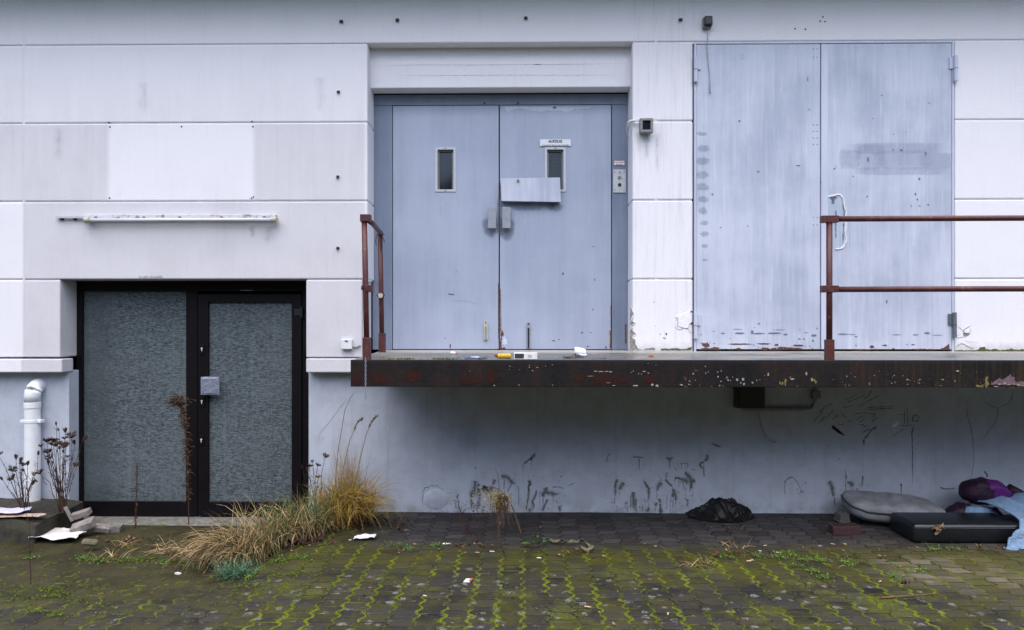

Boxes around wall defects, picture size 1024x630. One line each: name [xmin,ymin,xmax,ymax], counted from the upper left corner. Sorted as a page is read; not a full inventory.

flaking render [630,307,719,350]
peeling [732,343,813,351]
peeling [940,370,1024,388]